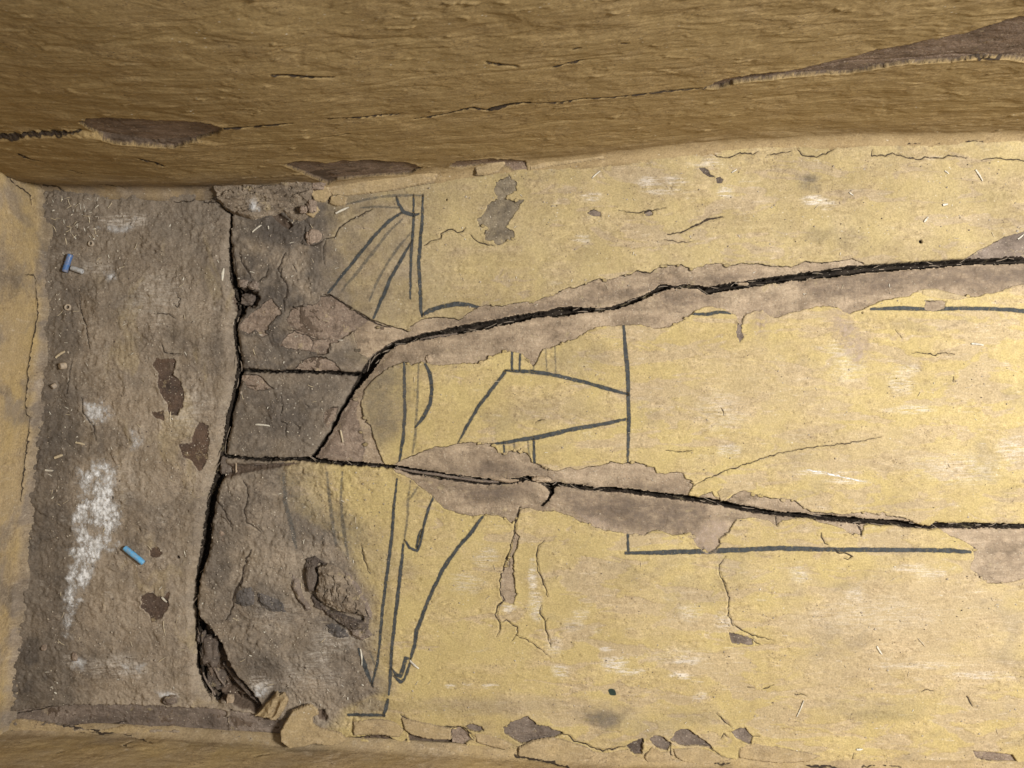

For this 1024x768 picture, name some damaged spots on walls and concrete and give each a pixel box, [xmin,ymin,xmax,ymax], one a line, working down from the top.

peeling [713,16,1024,85]
peeling [82,117,220,140]
peeling [449,156,605,245]
crack [176,200,1024,701]
peeling [239,232,1024,604]
damp [65,465,119,606]
flaking render [353,716,713,762]